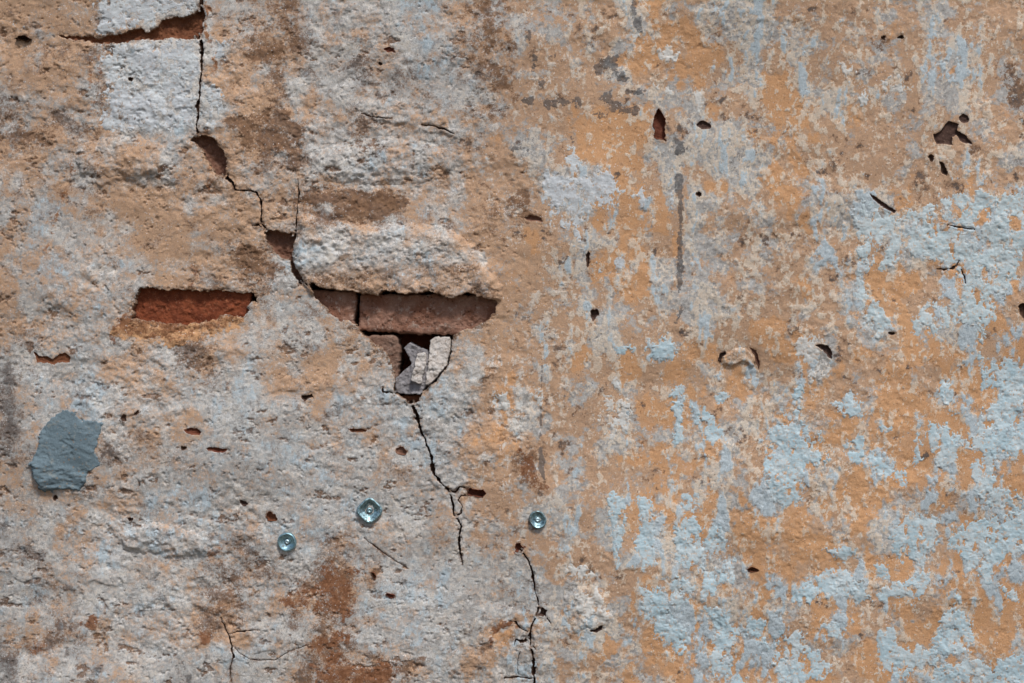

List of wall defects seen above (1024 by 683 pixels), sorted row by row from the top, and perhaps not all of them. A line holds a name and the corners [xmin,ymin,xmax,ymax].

peeling [57,0,233,179]
crack [193,0,206,137]
crack [221,170,302,237]
spalling [651,107,668,143]
spalling [926,112,974,177]
spalling [129,285,259,328]
spalling [262,228,499,406]
peeling [763,186,1024,606]
crack [380,387,468,565]
crack [505,548,554,683]
peeling [639,492,847,683]
peeling [876,593,1024,683]